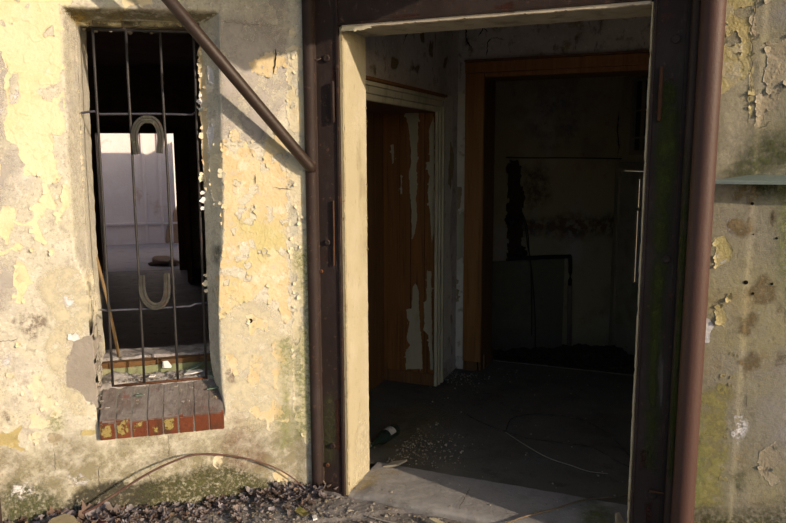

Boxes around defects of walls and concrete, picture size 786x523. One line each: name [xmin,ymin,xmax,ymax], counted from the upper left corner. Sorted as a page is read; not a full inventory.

peeling [0,0,72,304]
peeling [249,27,305,152]
crack [749,0,757,112]
peeling [721,0,786,127]
peeling [196,47,311,445]
peeling [448,89,465,356]
water stain [40,267,97,377]
flaking render [65,321,103,408]
water stain [7,294,307,519]
peeling [404,270,434,371]
peeling [705,293,733,343]
water stain [731,416,748,439]